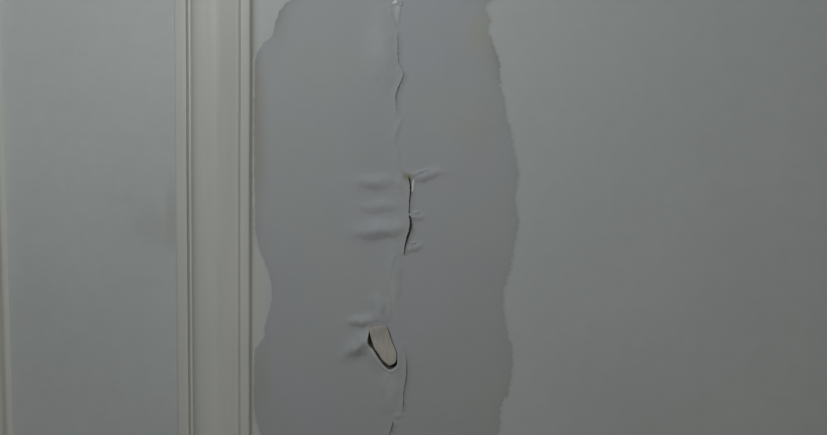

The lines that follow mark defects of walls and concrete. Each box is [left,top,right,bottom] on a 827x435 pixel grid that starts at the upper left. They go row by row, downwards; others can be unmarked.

crack [383,3,430,322]
flaking render [368,325,397,370]
crack [379,341,413,435]